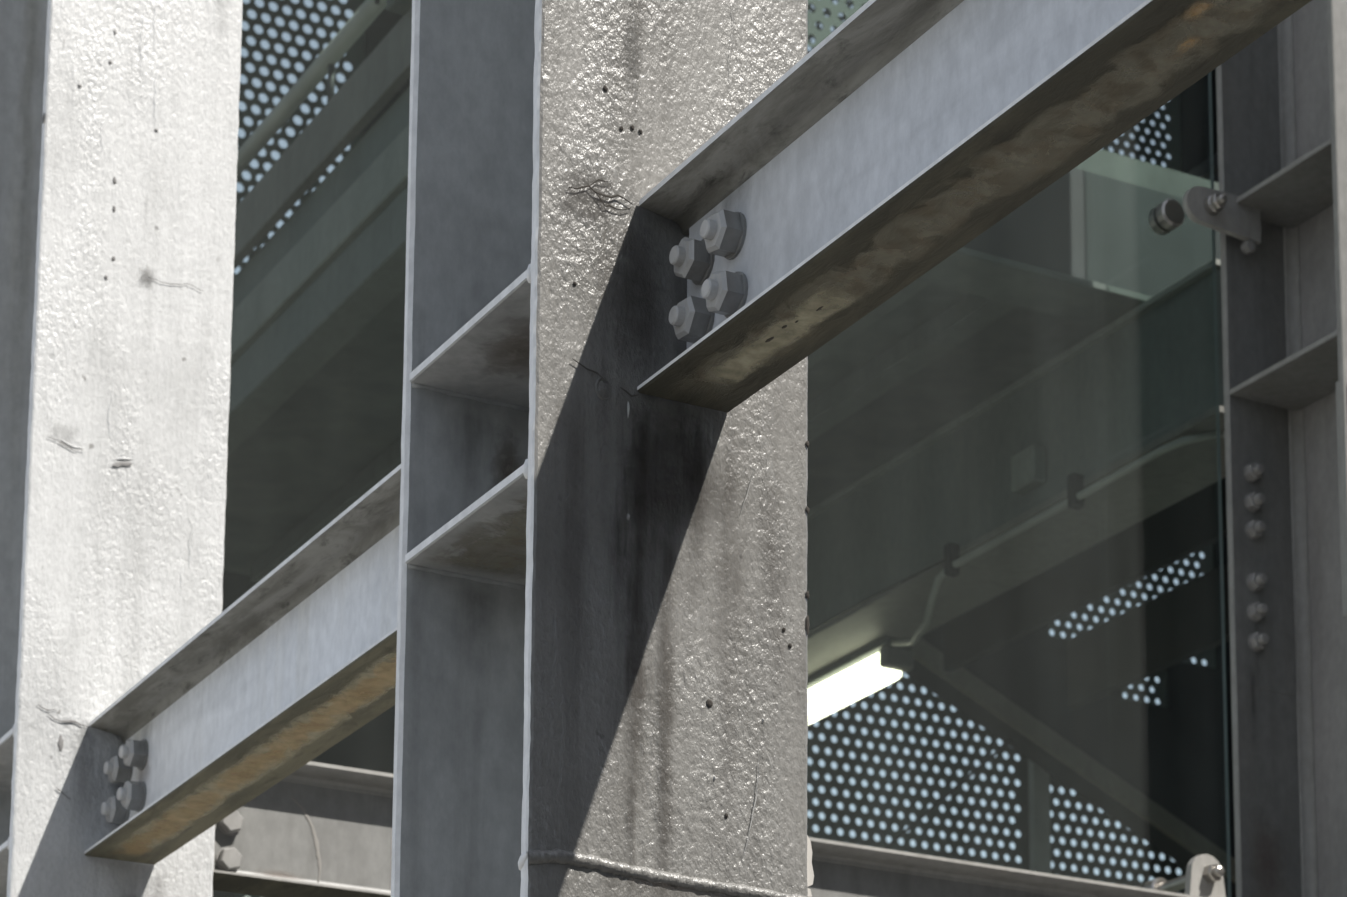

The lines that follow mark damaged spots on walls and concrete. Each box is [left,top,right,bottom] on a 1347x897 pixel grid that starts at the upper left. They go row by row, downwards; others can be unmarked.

crack [569,179,633,210]
rust [698,153,1033,386]
rust [129,653,397,846]